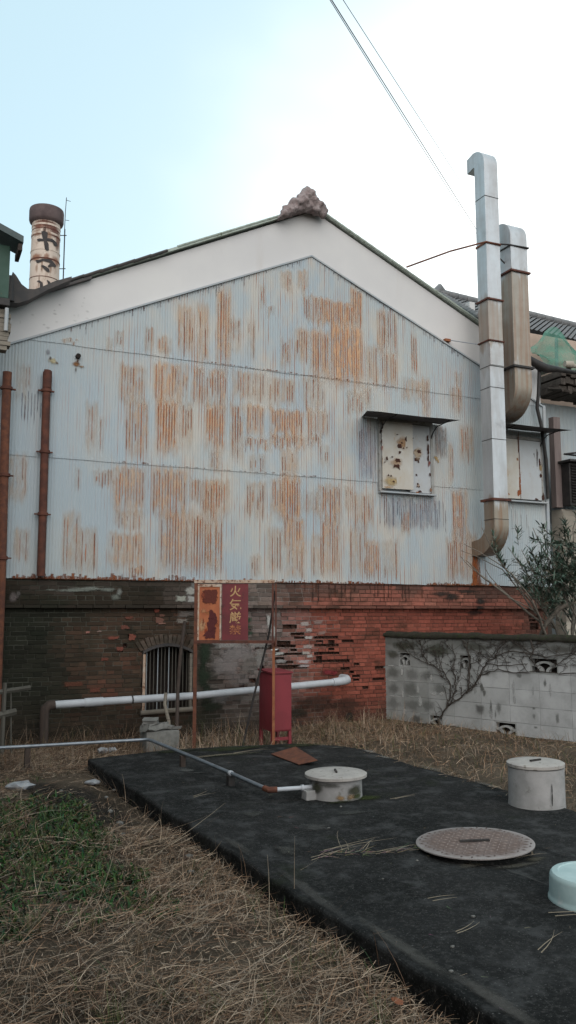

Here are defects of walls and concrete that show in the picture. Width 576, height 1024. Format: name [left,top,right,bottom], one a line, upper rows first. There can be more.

rust [12,272,413,584]
rust [427,491,500,586]
spalling [224,625,384,689]